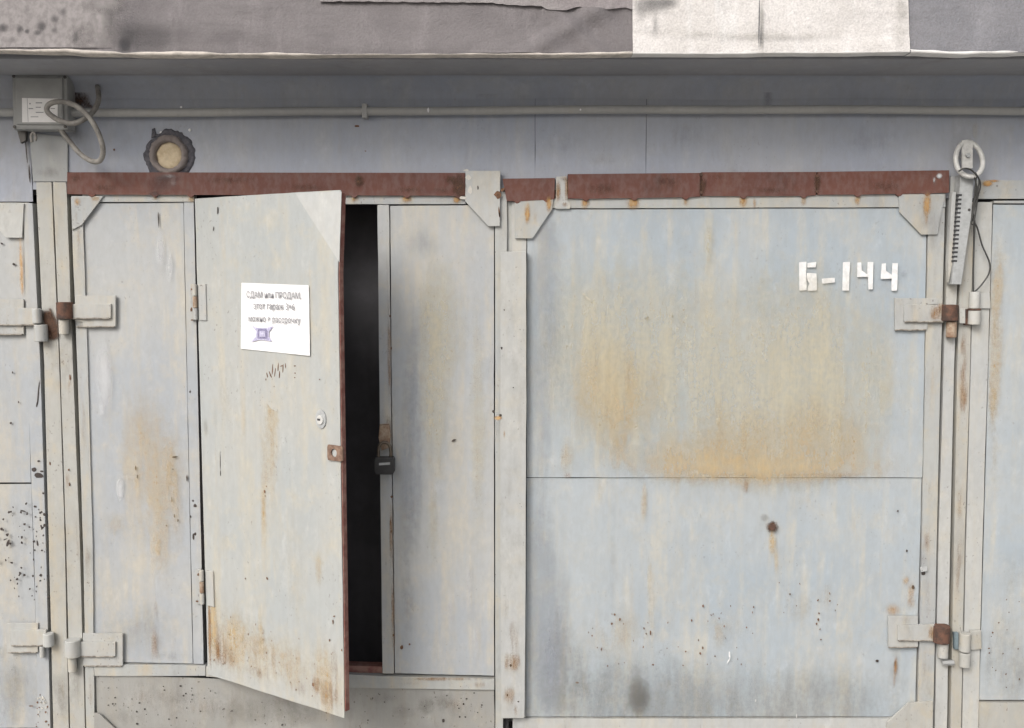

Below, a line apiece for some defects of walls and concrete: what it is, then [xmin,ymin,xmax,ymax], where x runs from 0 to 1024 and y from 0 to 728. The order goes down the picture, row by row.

rust [447,176,465,202]